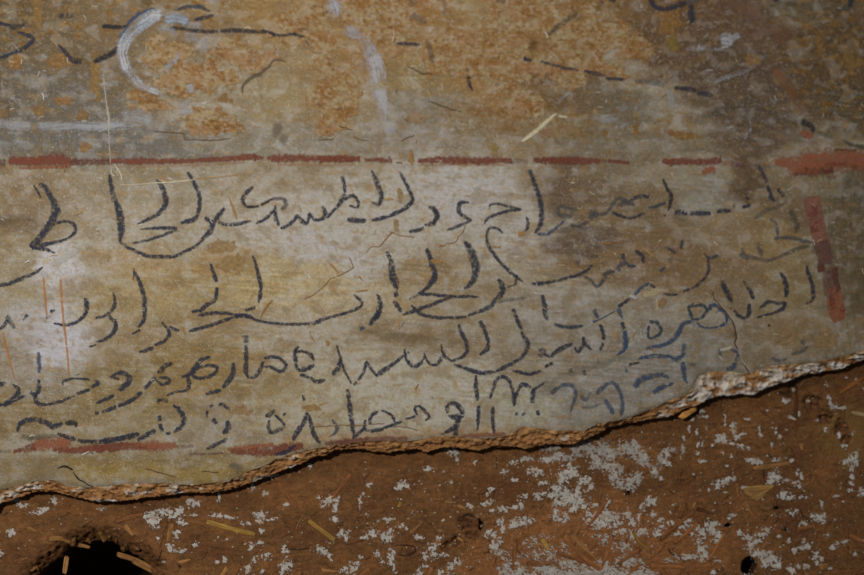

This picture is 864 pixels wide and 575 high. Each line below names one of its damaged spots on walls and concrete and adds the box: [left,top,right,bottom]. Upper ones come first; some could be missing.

flaking render [112,0,417,138]
flaking render [419,0,683,124]
peeling [667,130,701,140]
peeling [207,237,245,275]
spalling [0,328,864,575]